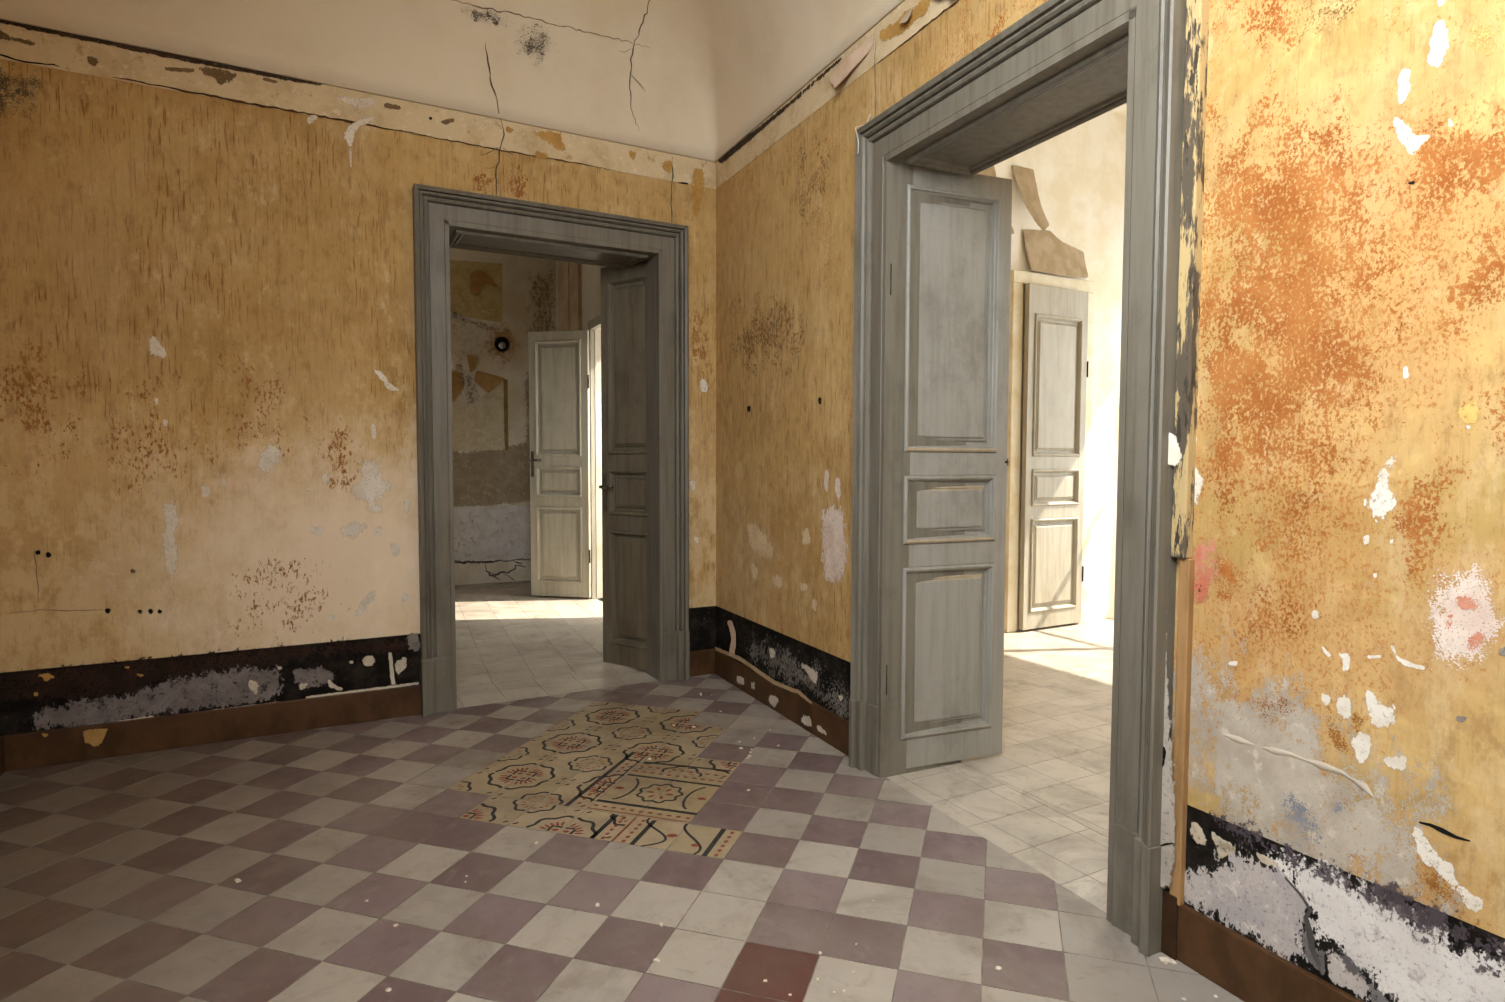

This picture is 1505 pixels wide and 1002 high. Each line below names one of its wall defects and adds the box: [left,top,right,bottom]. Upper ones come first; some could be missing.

leakage [461,2,556,68]
peeling [880,0,930,42]
peeling [1427,0,1449,68]
peeling [1392,68,1429,155]
peeling [1194,467,1204,506]
peeling [1363,455,1397,545]
flaking render [1322,554,1505,672]
peeling [0,633,421,737]
spalling [737,676,778,707]
spalling [801,663,818,684]
spalling [802,716,826,735]
flaking render [1160,616,1505,1002]